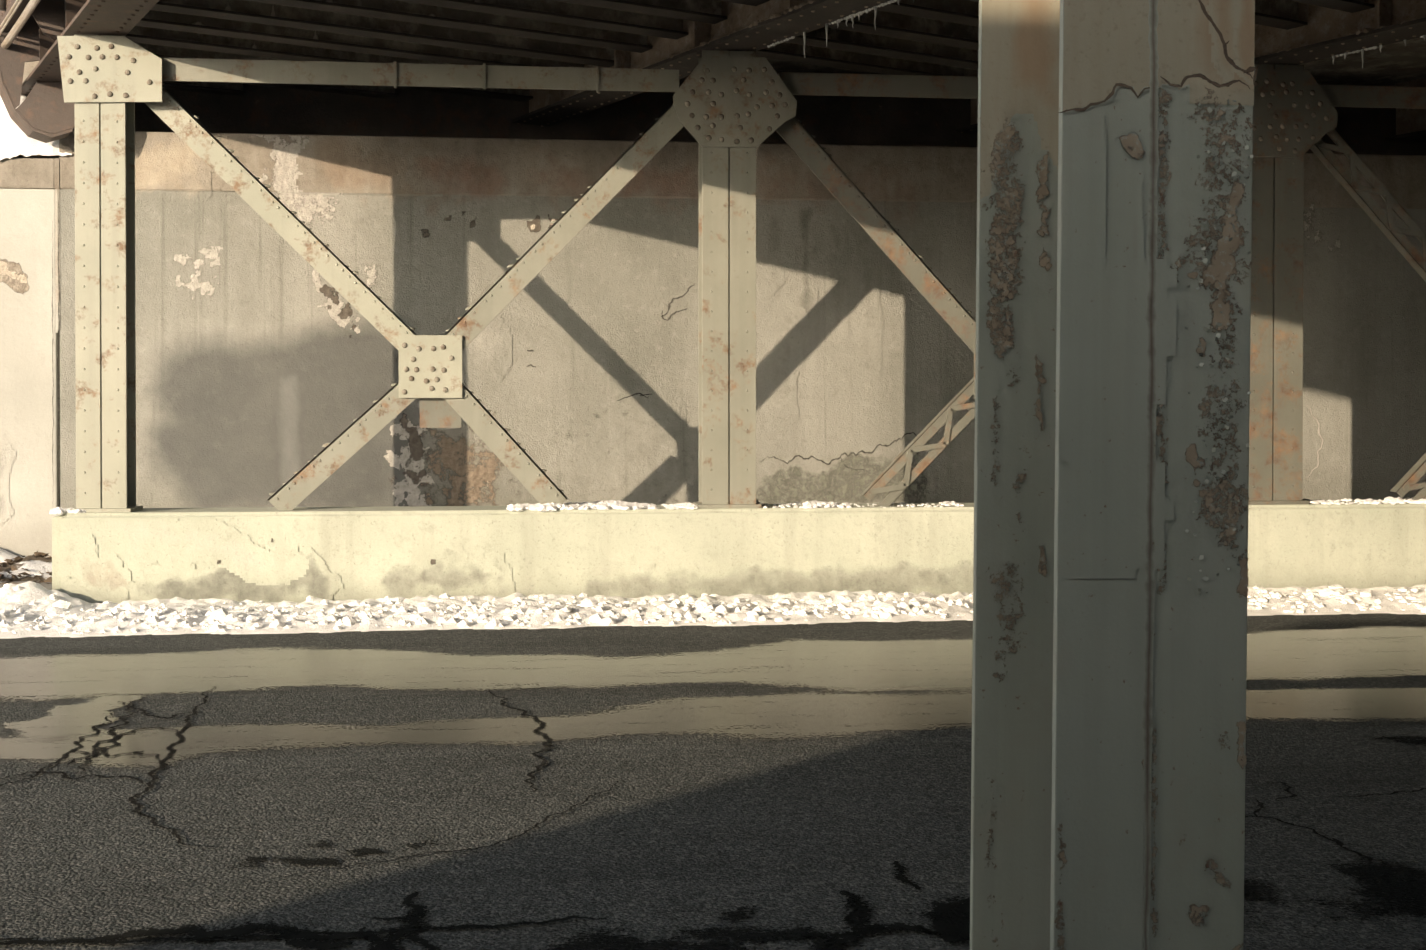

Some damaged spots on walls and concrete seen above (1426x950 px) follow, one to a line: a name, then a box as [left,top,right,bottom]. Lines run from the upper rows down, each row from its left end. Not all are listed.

crack [1198,0,1258,85]
spalling [0,259,29,294]
peeling [174,246,224,300]
peeling [1058,74,1254,597]
spalling [383,408,502,506]
spalling [757,452,927,504]
leakage [374,543,516,599]
leakage [576,555,974,598]
crack [0,686,216,847]
crack [272,686,618,879]
crack [0,891,606,950]
crack [799,861,970,950]